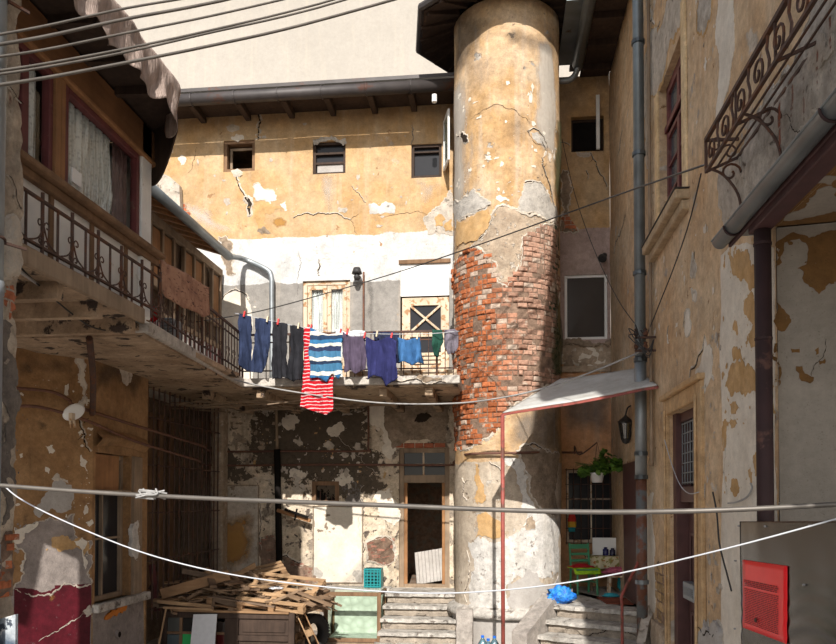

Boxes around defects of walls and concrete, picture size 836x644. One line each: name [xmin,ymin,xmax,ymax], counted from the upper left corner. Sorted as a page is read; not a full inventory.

spalling [644,0,681,170]
peeling [690,0,735,126]
crack [293,186,365,234]
crack [458,104,570,243]
flaking render [423,169,611,457]
peeling [228,406,401,525]
spalling [496,442,560,518]
peeling [695,242,757,644]
peeling [771,247,780,521]
spalling [0,497,94,598]
flaking render [257,515,323,584]
flaking render [345,528,398,583]